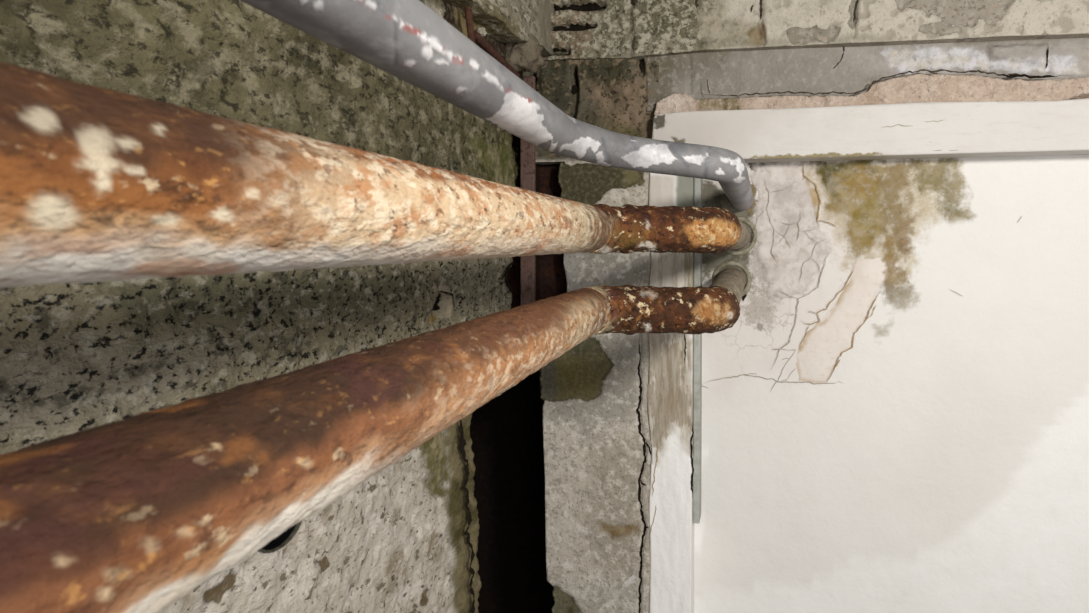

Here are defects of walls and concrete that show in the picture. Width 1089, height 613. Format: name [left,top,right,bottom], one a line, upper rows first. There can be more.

peeling [786,0,858,45]
crack [697,47,1061,96]
peeling [896,0,1016,36]
leakage [881,46,1084,75]
leakage [702,181,757,285]
crack [703,162,881,392]
leakage [748,152,971,307]
crack [459,420,475,613]
crack [636,334,694,613]